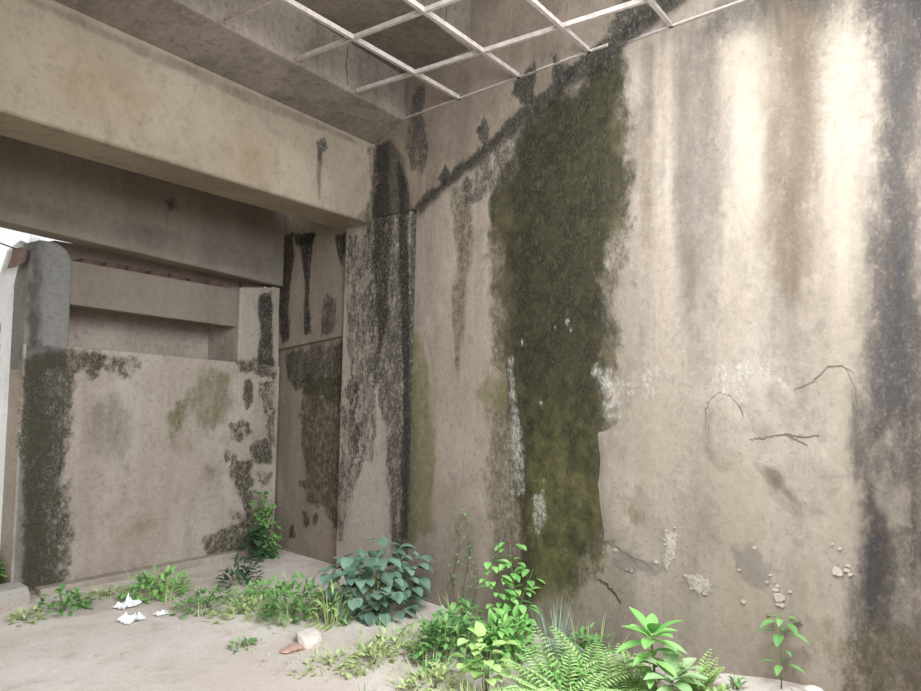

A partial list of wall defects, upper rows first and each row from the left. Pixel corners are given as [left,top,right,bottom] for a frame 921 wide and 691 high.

mould [17,348,135,589]
damp [224,0,685,600]
crack [705,392,745,429]
crack [749,433,819,460]
crack [794,365,856,434]
damp [873,0,921,478]